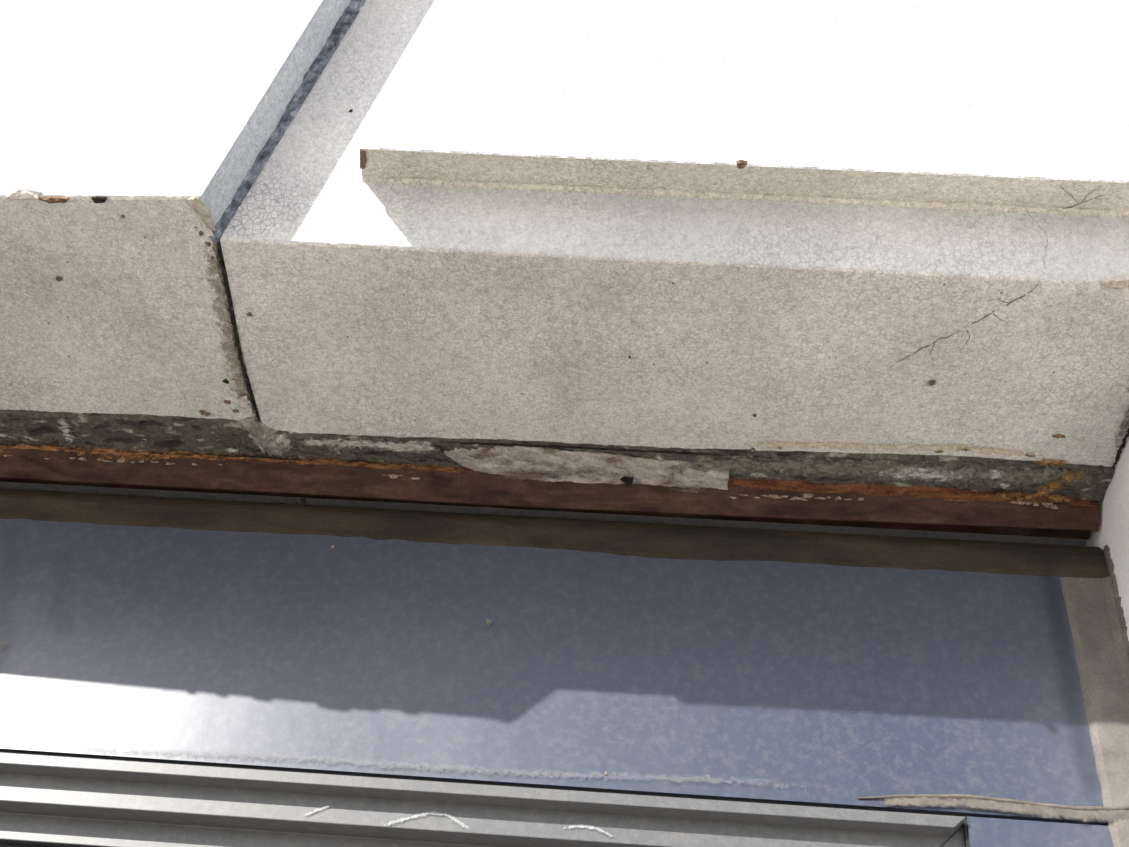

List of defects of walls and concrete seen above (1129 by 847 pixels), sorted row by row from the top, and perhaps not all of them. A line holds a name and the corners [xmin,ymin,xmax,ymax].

crack [216,184,300,422]
crack [890,185,1106,368]
rust [0,444,470,473]
peeling [302,438,863,501]
rust [728,460,1098,510]
peeling [1008,500,1058,509]